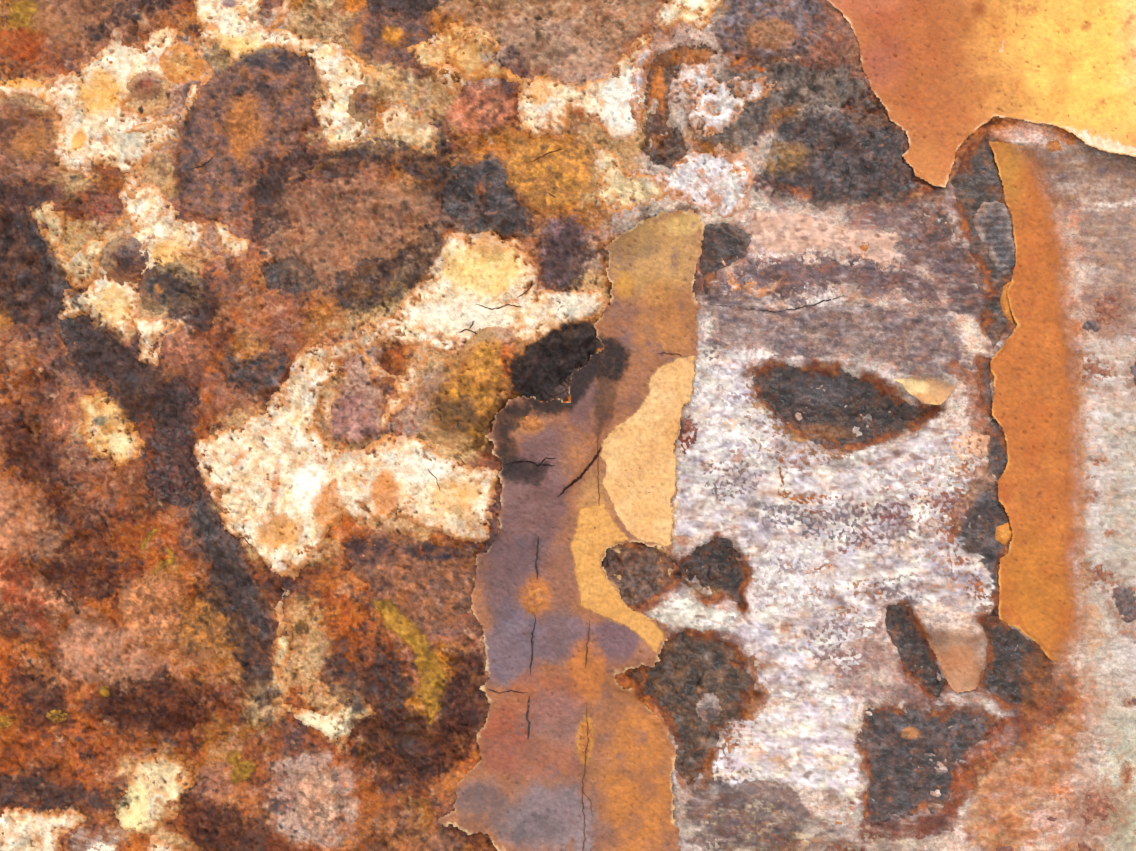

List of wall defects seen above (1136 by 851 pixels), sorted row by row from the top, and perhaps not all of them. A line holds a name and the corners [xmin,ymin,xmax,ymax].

corrosion [251,137,450,245]
corrosion [0,178,189,429]
corrosion [156,269,218,332]
corrosion [326,226,443,312]
peeling [193,0,784,851]
corrosion [678,416,698,454]
spalling [750,356,955,453]
peeling [828,0,1136,827]
corrosion [1071,352,1136,395]
corrosion [206,543,280,721]
corrosion [1088,563,1136,644]
corrosion [0,670,132,813]